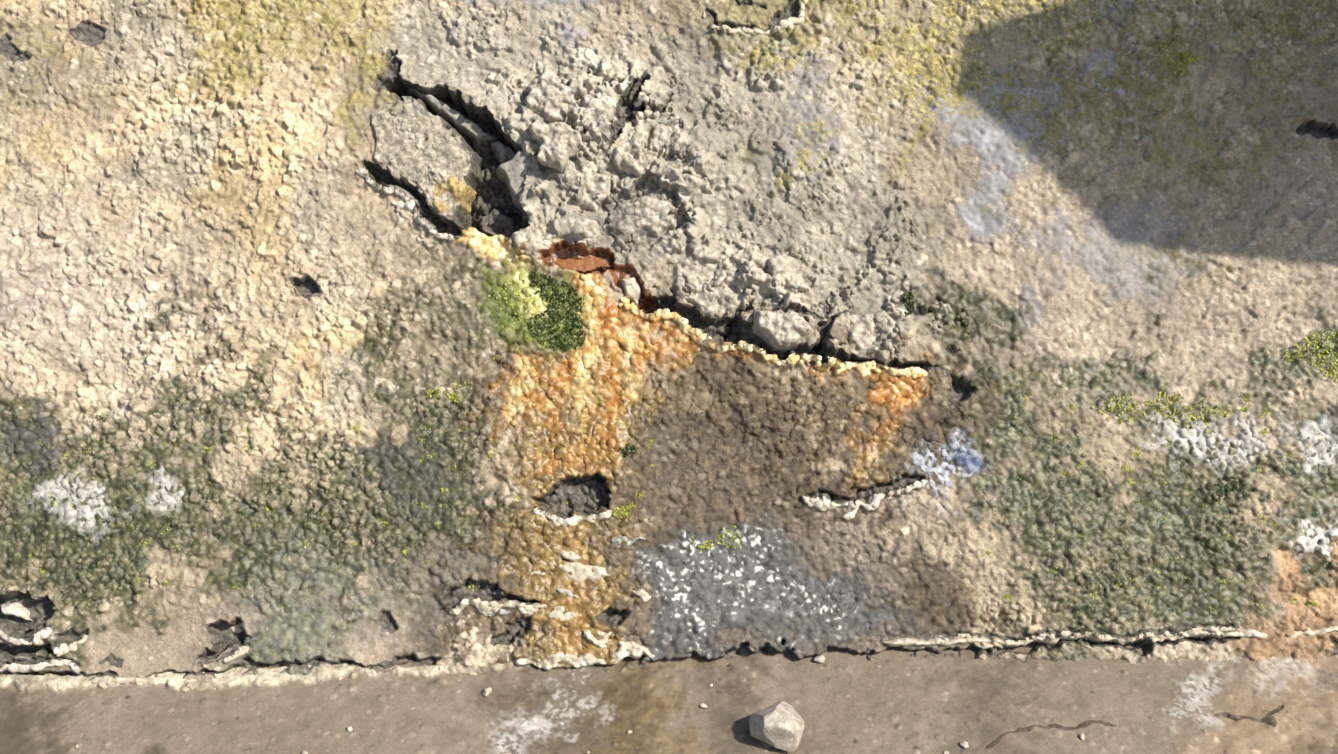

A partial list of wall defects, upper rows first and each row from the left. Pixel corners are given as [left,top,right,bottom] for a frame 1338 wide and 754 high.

crack [702,0,808,36]
corrosion [457,227,529,270]
spalling [356,49,714,315]
spalling [0,590,81,674]
damp [0,478,386,636]
crack [0,627,441,685]
spalling [532,472,612,527]
corrosion [497,270,696,665]
damp [576,346,1001,672]
crack [438,536,1338,672]
corrosion [854,374,924,484]
damp [1030,419,1262,619]